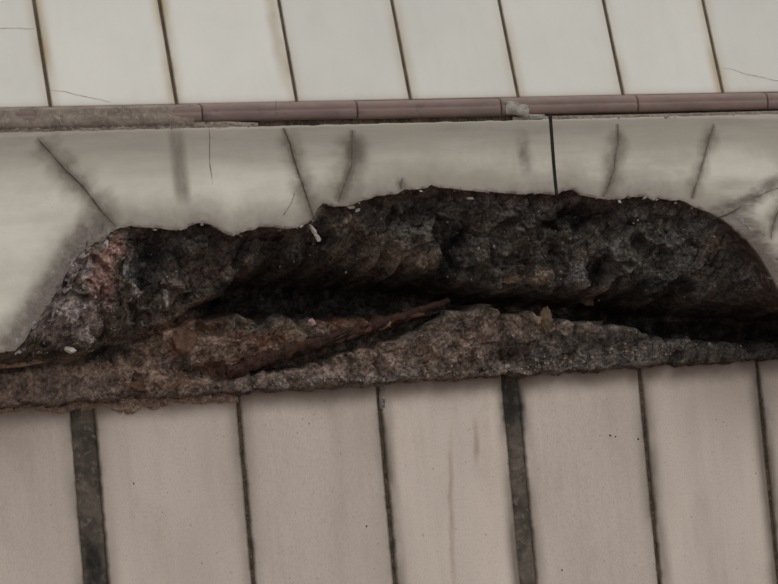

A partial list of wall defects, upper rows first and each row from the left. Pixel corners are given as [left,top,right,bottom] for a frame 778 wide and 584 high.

crack [40,141,112,222]
crack [284,130,314,218]
spalling [0,186,778,414]